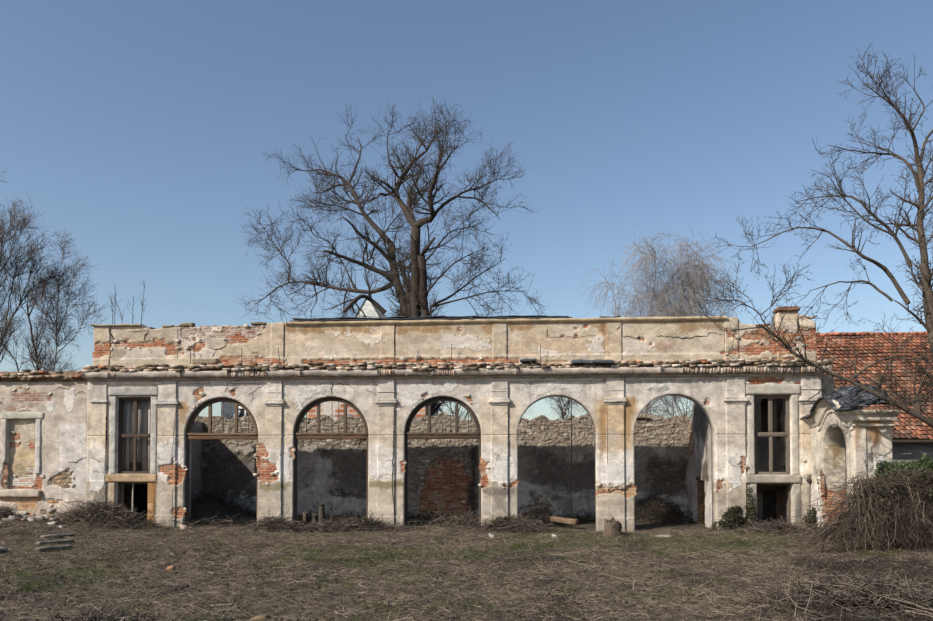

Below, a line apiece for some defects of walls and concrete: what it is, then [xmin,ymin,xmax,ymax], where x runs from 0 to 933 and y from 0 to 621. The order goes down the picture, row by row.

flaking render [92,324,265,358]
flaking render [219,355,285,364]
crack [660,323,725,352]
flaking render [720,326,819,360]
flaking render [0,386,76,413]
flaking render [9,430,35,451]
flaking render [0,460,75,516]
peeling [156,436,188,486]
flaking render [228,444,296,500]
peeling [595,463,637,498]
flaking render [818,468,847,528]